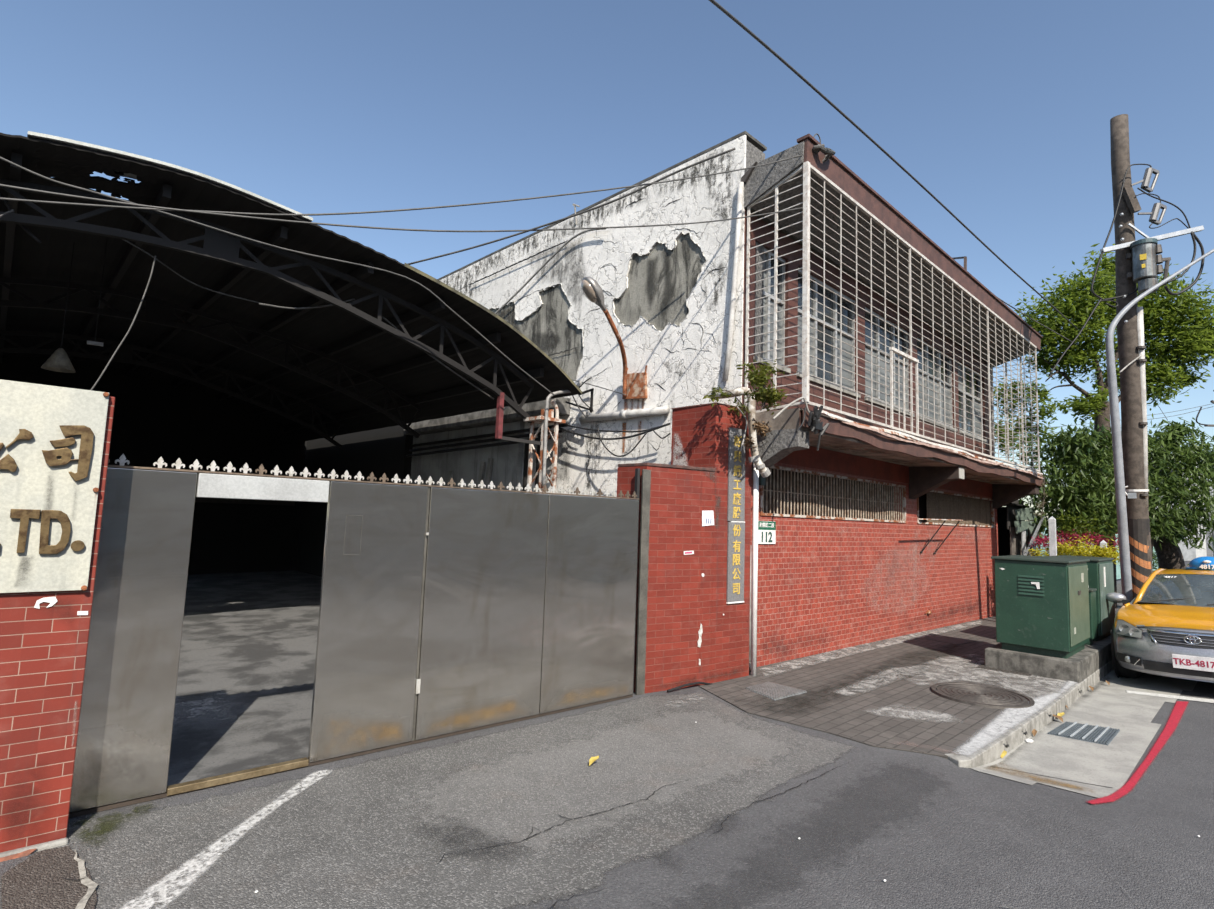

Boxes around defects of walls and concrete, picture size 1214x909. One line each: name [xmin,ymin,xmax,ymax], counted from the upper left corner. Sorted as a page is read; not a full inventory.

water stain [661,152,732,219]
spalling [491,283,584,381]
water stain [444,190,646,300]
crack [548,241,617,356]
spalling [612,230,708,331]
crack [654,323,716,391]
crack [669,228,726,295]